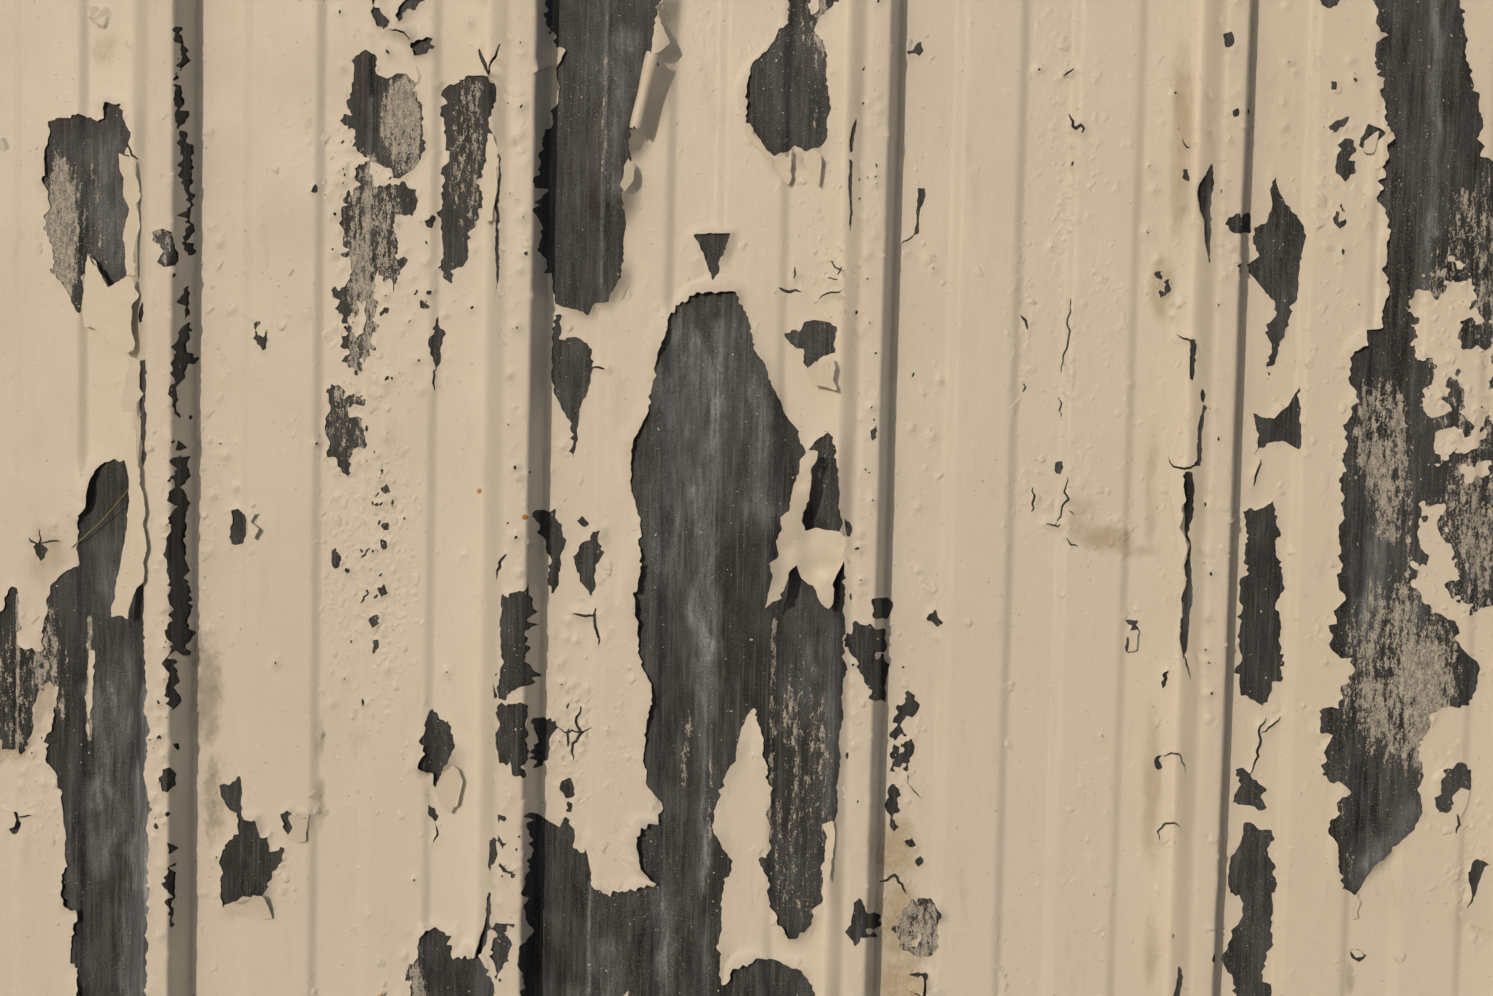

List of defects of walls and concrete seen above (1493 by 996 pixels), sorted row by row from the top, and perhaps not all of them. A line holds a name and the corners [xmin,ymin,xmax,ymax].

peeling [0,20,207,996]
peeling [212,768,315,920]
peeling [311,0,674,660]
peeling [396,225,951,996]
peeling [735,0,846,186]
peeling [1202,0,1493,996]